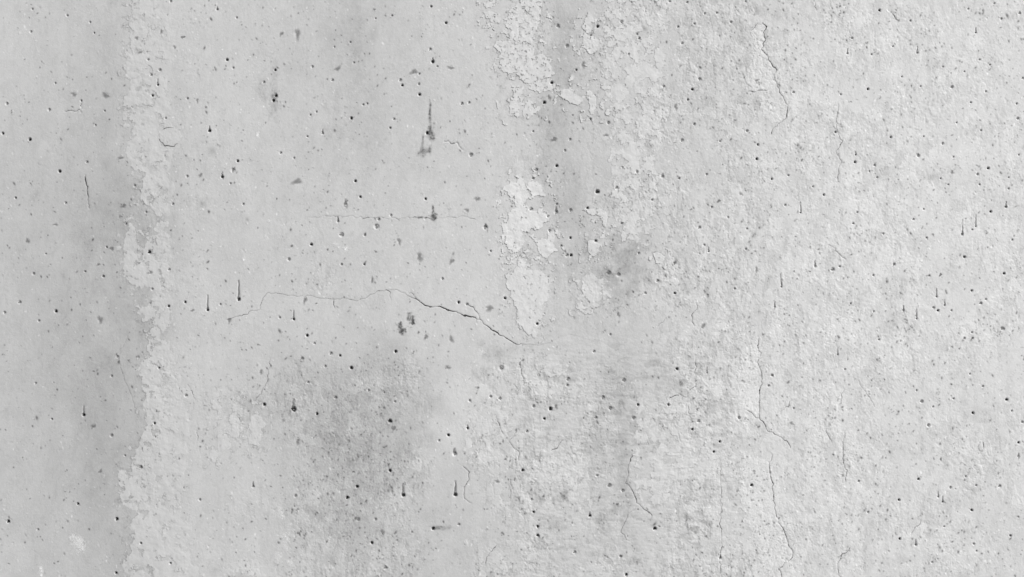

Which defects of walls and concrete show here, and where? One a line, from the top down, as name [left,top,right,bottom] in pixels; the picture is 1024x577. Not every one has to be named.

crack [735,8,788,134]
peeling [476,0,672,316]
crack [227,289,582,395]
peeling [496,167,571,404]
peeling [518,451,594,491]
crack [621,453,652,541]
crack [747,339,793,576]